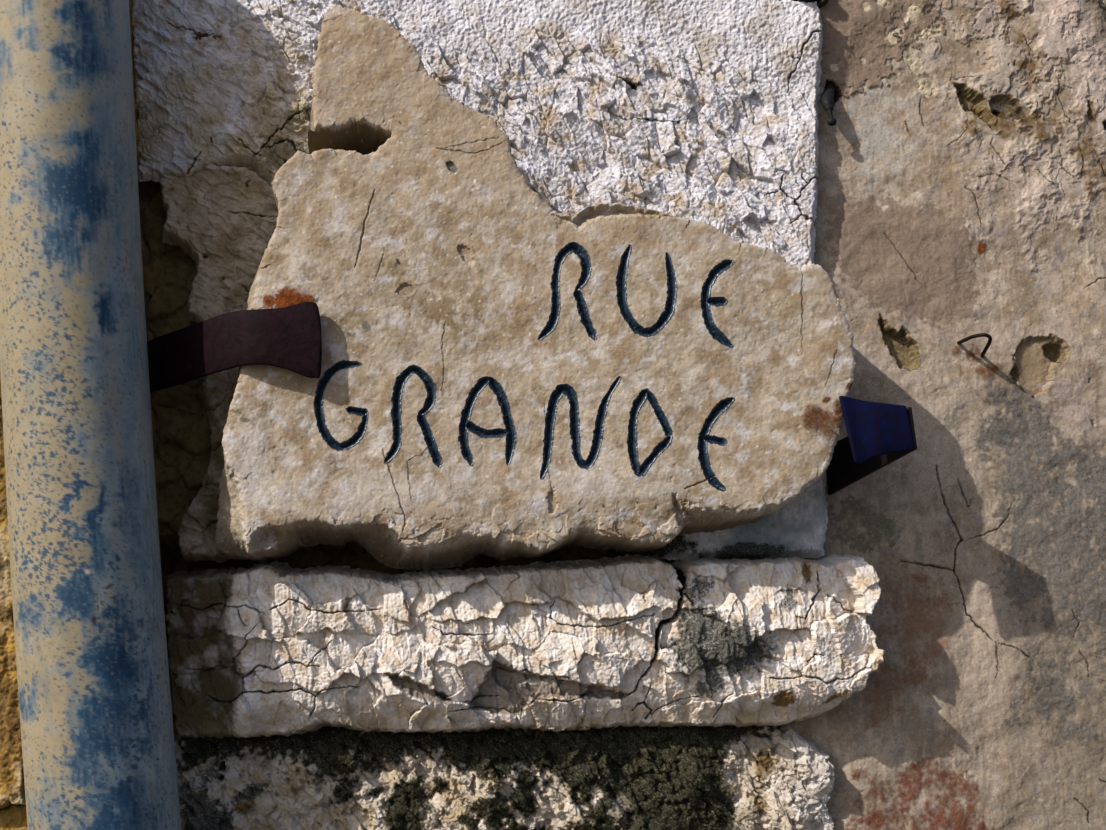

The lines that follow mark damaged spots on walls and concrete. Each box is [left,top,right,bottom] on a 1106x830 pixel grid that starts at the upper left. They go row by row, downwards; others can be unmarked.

crack [788,31,822,91]
peeling [819,0,946,98]
spalling [952,82,1020,129]
crack [764,174,818,222]
peeling [827,195,981,371]
spalling [1009,334,1103,426]
water stain [0,604,14,624]
crack [550,567,693,719]
crack [909,470,1028,670]
water stain [0,648,22,789]
crack [461,669,584,714]